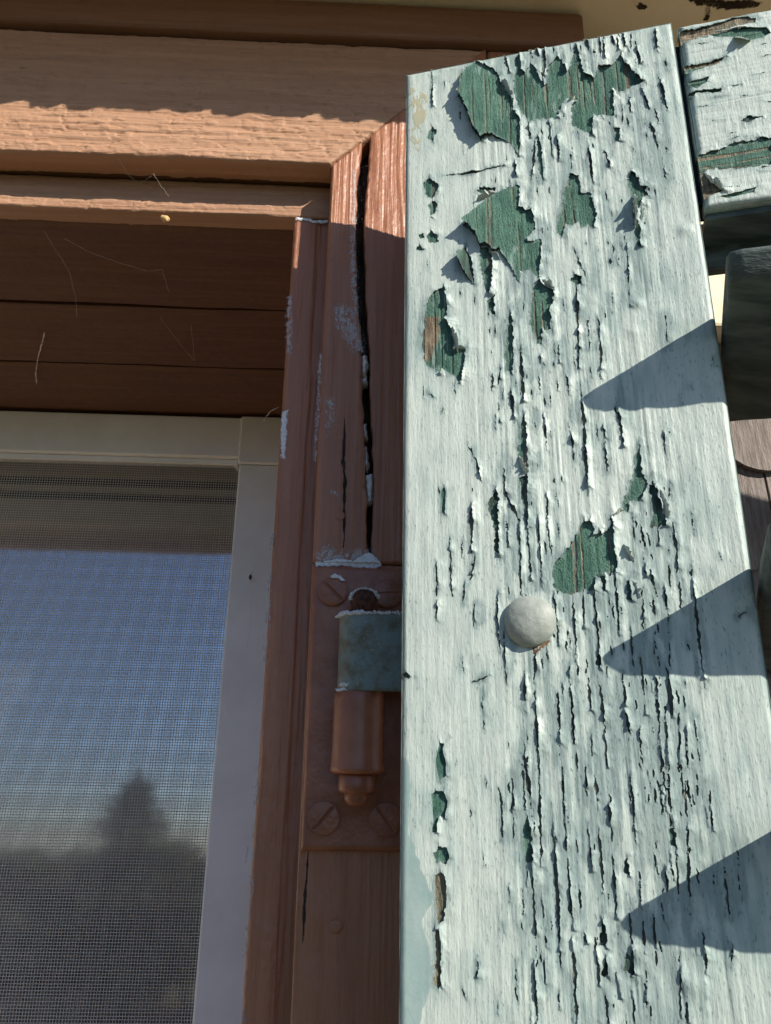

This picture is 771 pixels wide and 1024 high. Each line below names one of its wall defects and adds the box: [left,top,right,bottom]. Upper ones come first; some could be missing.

peeling [677,17,771,46]
peeling [455,43,647,179]
peeling [416,174,441,251]
peeling [556,172,598,236]
peeling [695,135,771,200]
peeling [456,182,560,374]
crack [341,165,374,553]
peeling [422,284,466,382]
peeling [488,485,505,557]
peeling [552,443,671,601]
crack [301,851,309,943]
peeling [431,741,454,989]